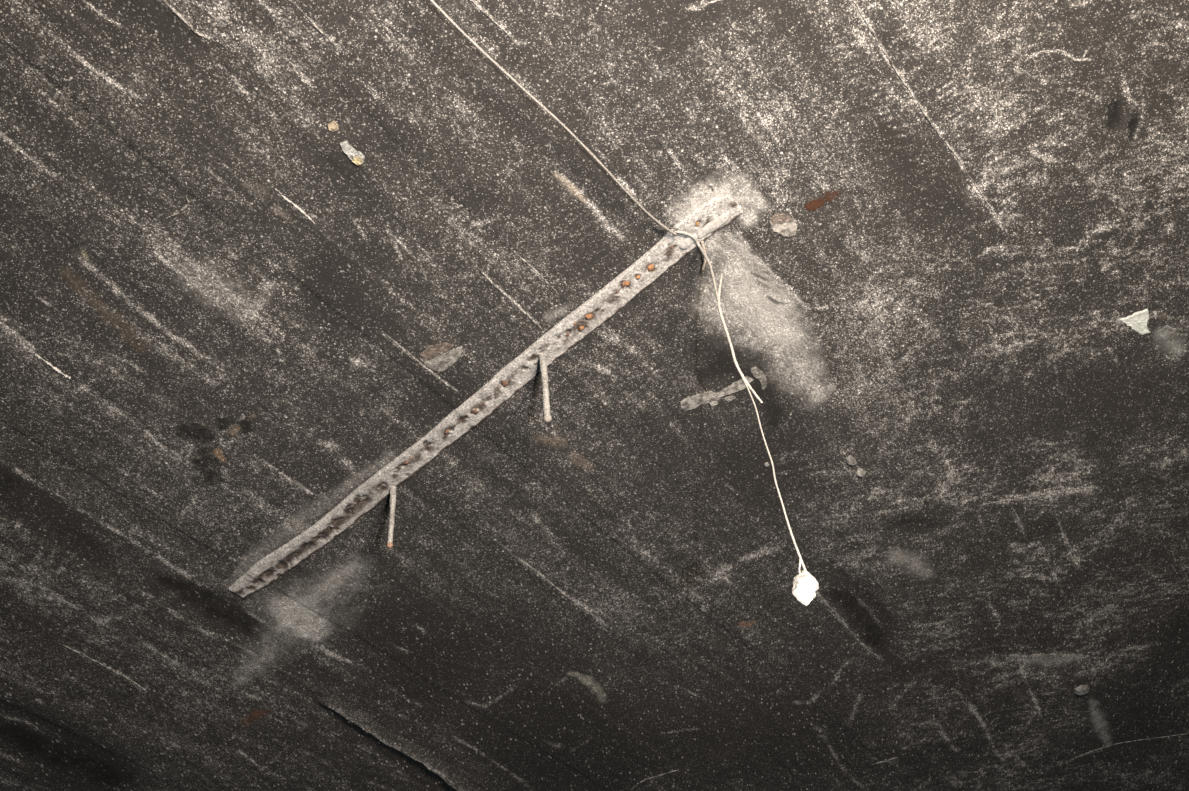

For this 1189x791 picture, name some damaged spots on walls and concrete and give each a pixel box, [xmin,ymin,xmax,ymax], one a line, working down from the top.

rust [805,191,838,210]
rust [615,264,655,293]
damp [672,176,828,425]
spalling [419,342,463,371]
peeling [680,365,767,412]
damp [240,565,363,678]